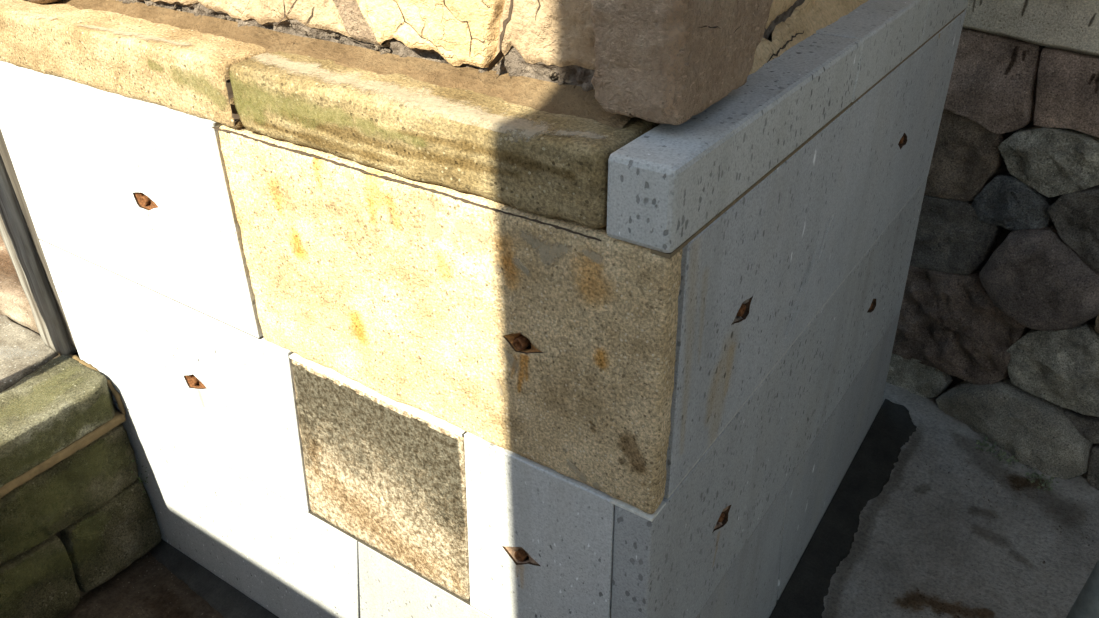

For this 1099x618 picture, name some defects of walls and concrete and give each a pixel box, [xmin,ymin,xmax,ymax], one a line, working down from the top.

crack [276,0,315,33]
crack [393,0,540,72]
crack [767,31,804,63]